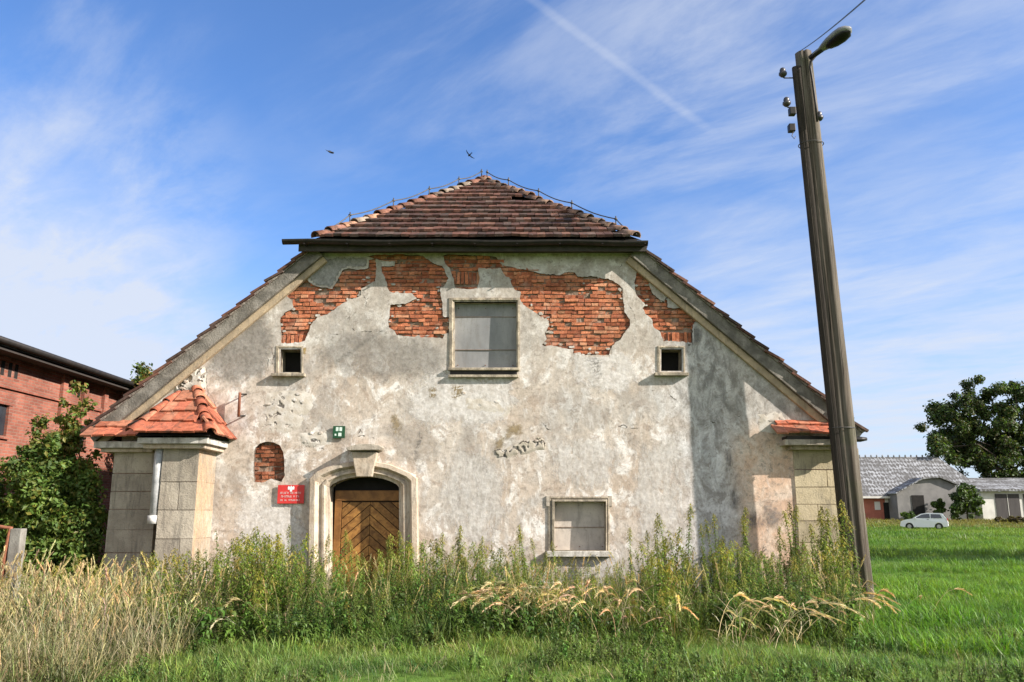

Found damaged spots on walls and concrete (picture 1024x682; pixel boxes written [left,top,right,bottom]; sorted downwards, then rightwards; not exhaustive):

flaking render [280,254,695,355]
flaking render [492,437,546,461]